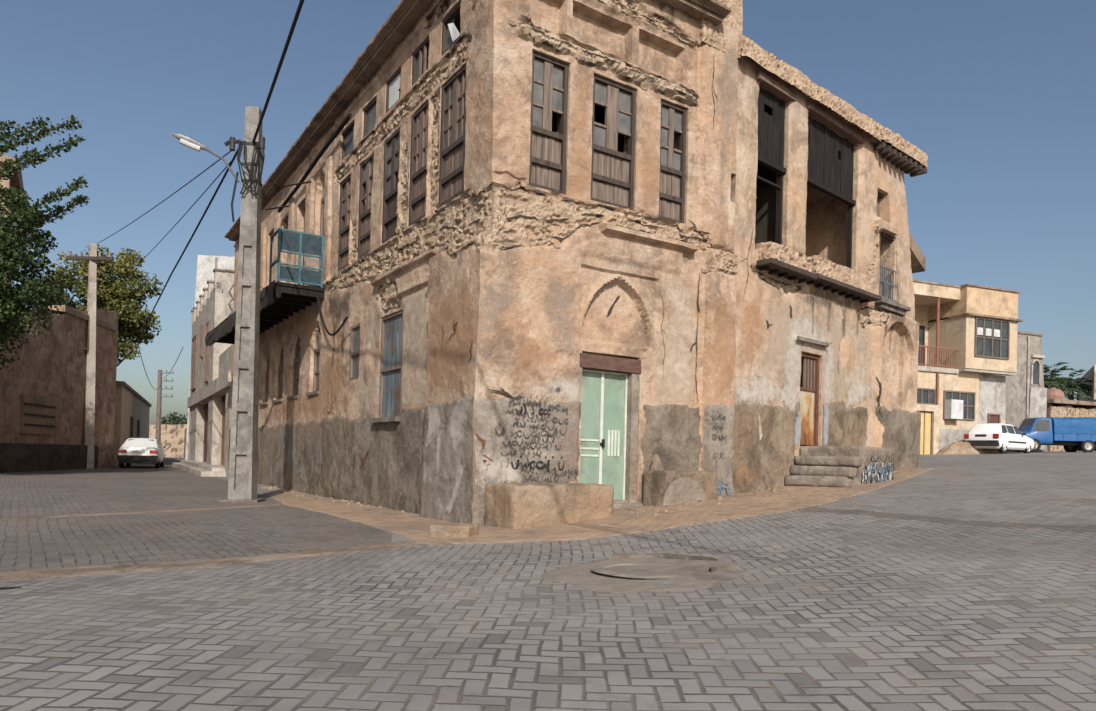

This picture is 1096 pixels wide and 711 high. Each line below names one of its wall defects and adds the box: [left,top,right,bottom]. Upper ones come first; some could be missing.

spalling [422,0,456,28]
spalling [598,0,701,47]
spalling [508,14,700,107]
spalling [325,35,804,313]
crack [659,273,700,400]
damp [440,468,463,513]
damp [475,451,521,483]